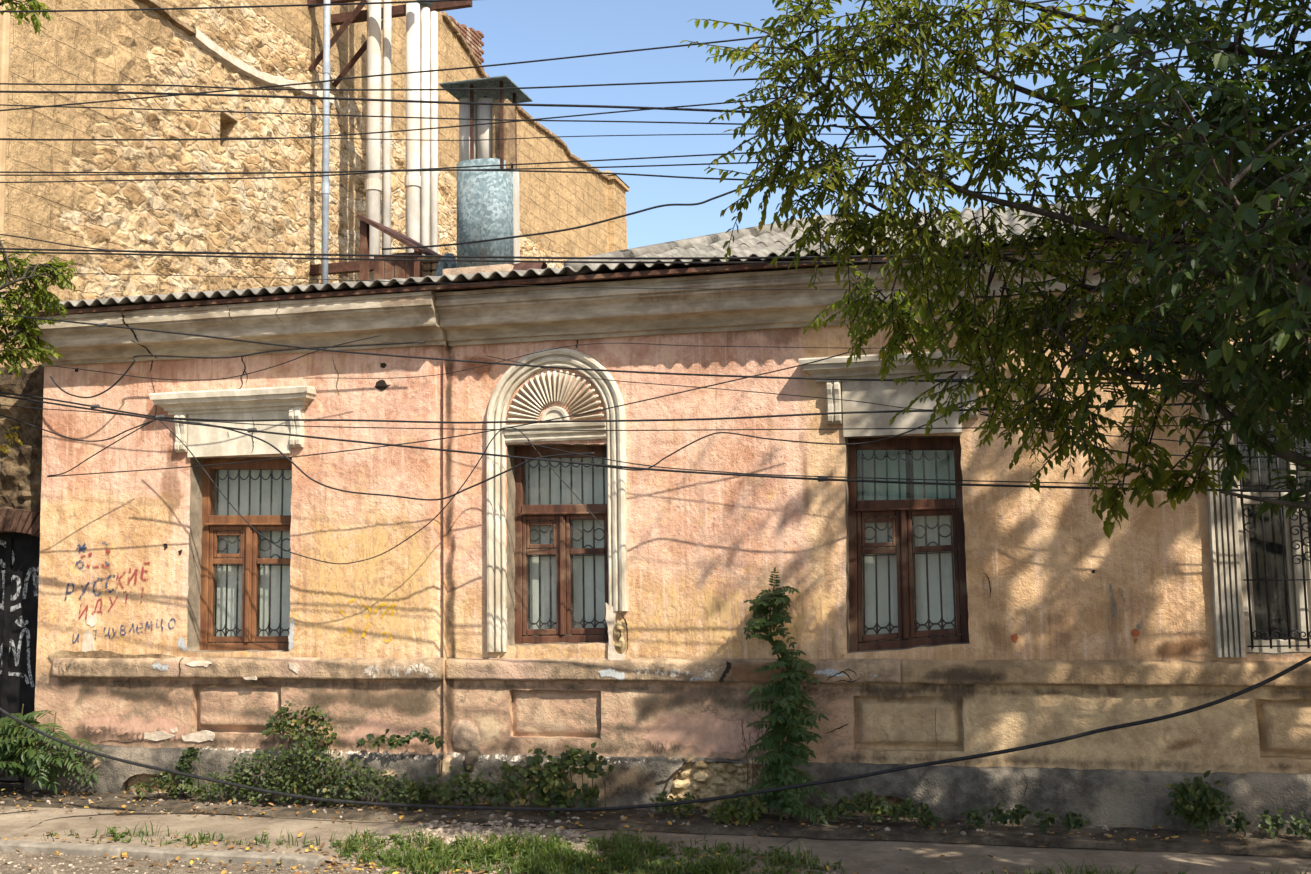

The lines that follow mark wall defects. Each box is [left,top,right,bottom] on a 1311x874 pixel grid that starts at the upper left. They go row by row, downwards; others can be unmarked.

crack [121,312,158,416]
water stain [446,346,455,658]
peeling [598,581,828,680]
water stain [1160,640,1204,656]
water stain [58,664,176,701]
peeling [364,663,435,678]
peeling [814,668,847,677]
water stain [862,668,1002,701]
water stain [78,726,143,742]
peeling [80,715,215,742]
water stain [311,679,483,760]